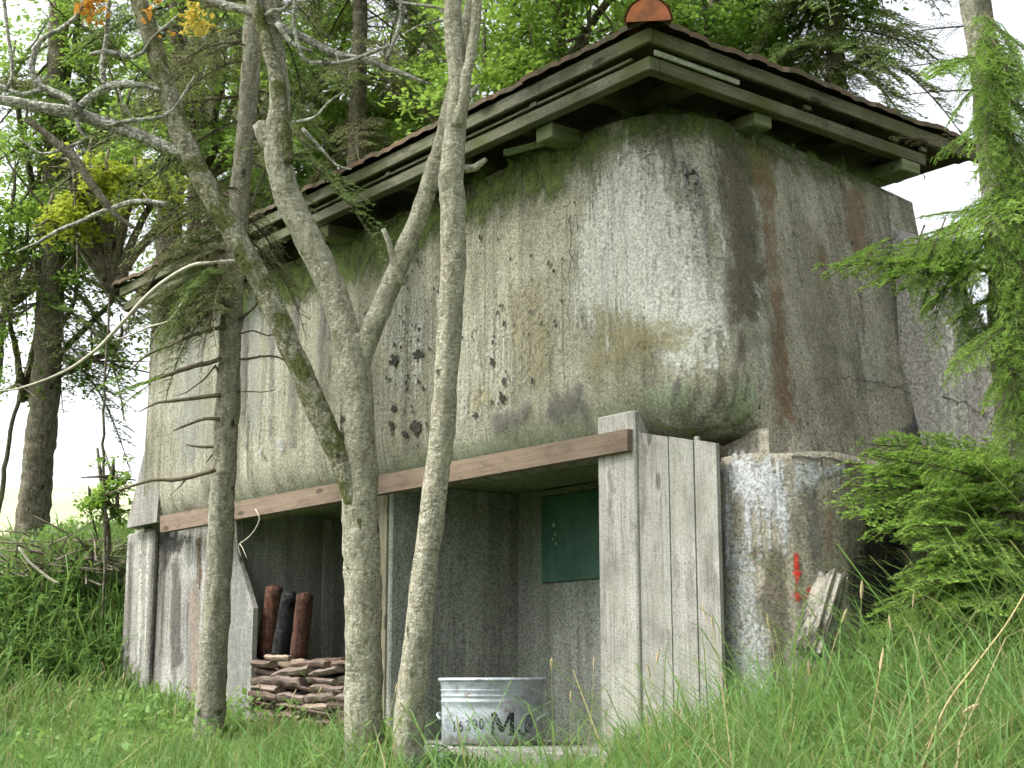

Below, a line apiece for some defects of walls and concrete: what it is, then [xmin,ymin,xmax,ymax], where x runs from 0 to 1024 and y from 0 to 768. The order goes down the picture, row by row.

leakage [389,314,432,398]
leakage [457,296,538,433]
leakage [546,383,589,425]
leakage [570,131,766,435]
rust [748,143,798,428]
crack [842,376,911,394]
leakage [126,527,191,678]
leakage [722,452,846,707]